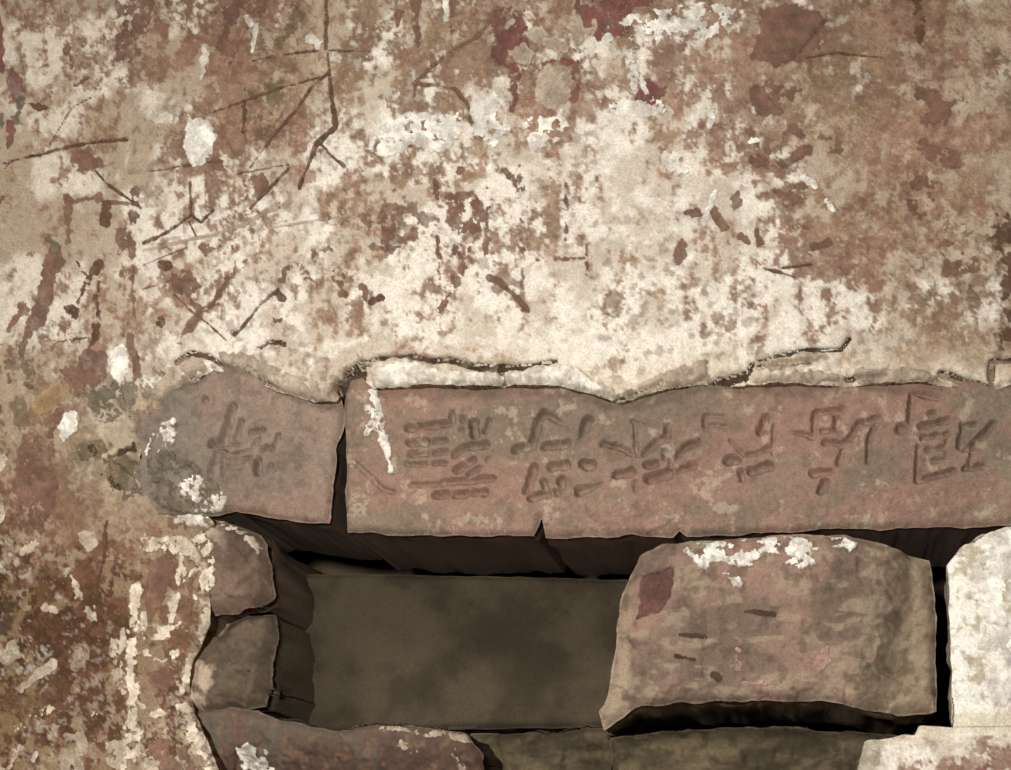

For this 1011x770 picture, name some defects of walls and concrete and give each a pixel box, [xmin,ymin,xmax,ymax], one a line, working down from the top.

spalling [338,363,371,395]
crack [345,354,558,388]
crack [708,338,851,388]
spalling [167,514,212,528]
water stain [830,536,857,551]
water stain [683,536,818,587]
spalling [636,567,674,620]
spalling [744,609,776,617]
spalling [735,637,777,687]